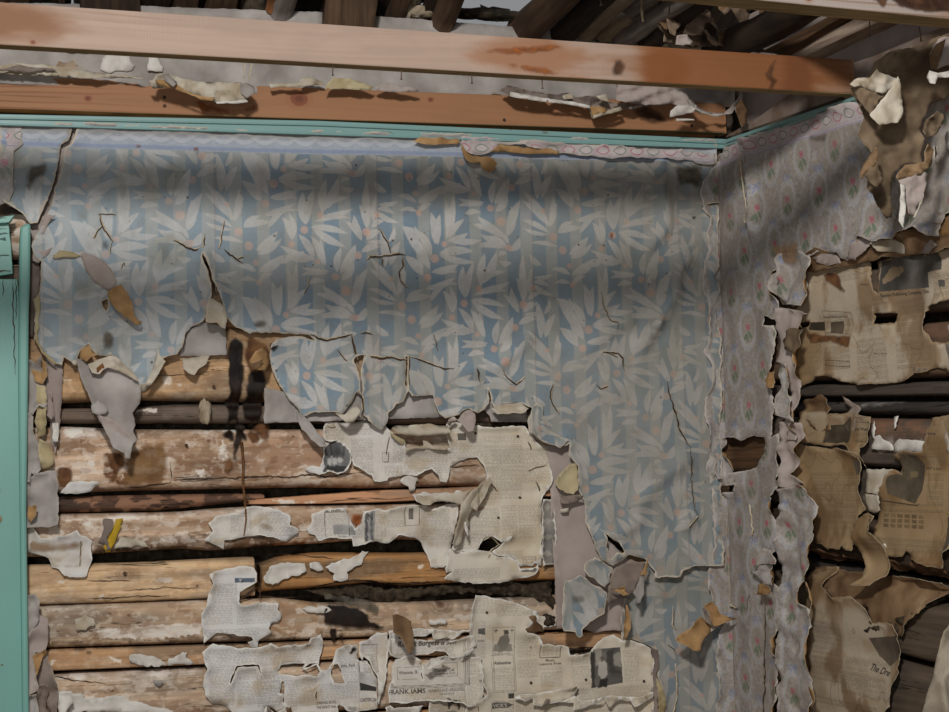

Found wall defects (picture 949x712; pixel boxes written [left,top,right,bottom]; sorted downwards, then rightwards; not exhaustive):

crack [367,228,408,287]
crack [310,331,453,388]
crack [596,292,625,389]
water stain [223,338,277,471]
crack [550,384,560,414]
peeling [555,463,579,495]
peeling [722,436,765,471]
peeling [525,615,544,633]
peeling [651,647,659,712]